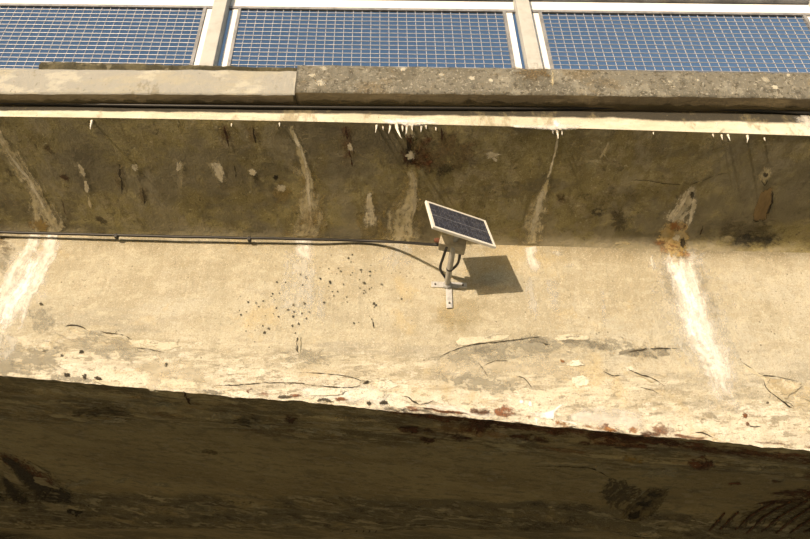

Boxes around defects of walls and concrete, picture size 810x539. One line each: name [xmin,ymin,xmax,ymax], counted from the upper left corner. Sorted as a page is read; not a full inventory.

damp [513,120,580,271]
damp [0,130,66,359]
damp [239,126,344,334]
crack [215,372,369,388]
crack [742,362,809,409]
rust [384,404,810,470]
spalling [0,453,89,517]
spalling [601,478,669,523]
spalling [709,489,810,534]